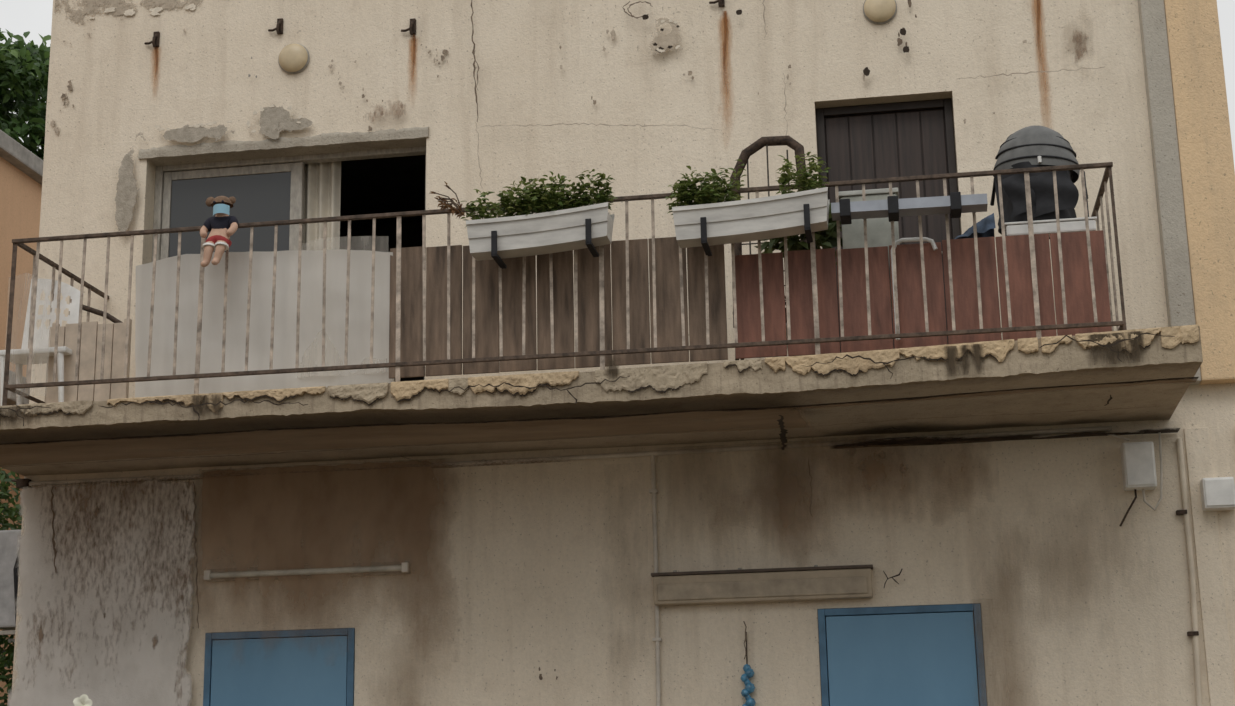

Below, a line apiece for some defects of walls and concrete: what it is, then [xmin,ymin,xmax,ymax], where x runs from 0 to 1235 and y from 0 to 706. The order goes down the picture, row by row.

peeling [54,0,203,36]
rust [721,11,729,96]
spalling [897,27,909,53]
rust [1034,0,1046,90]
peeling [115,105,312,232]
spalling [0,371,579,418]
damp [607,359,618,377]
spalling [595,362,708,393]
spalling [724,324,1199,377]
damp [946,344,982,376]
crack [777,415,813,517]
damp [0,377,1198,614]